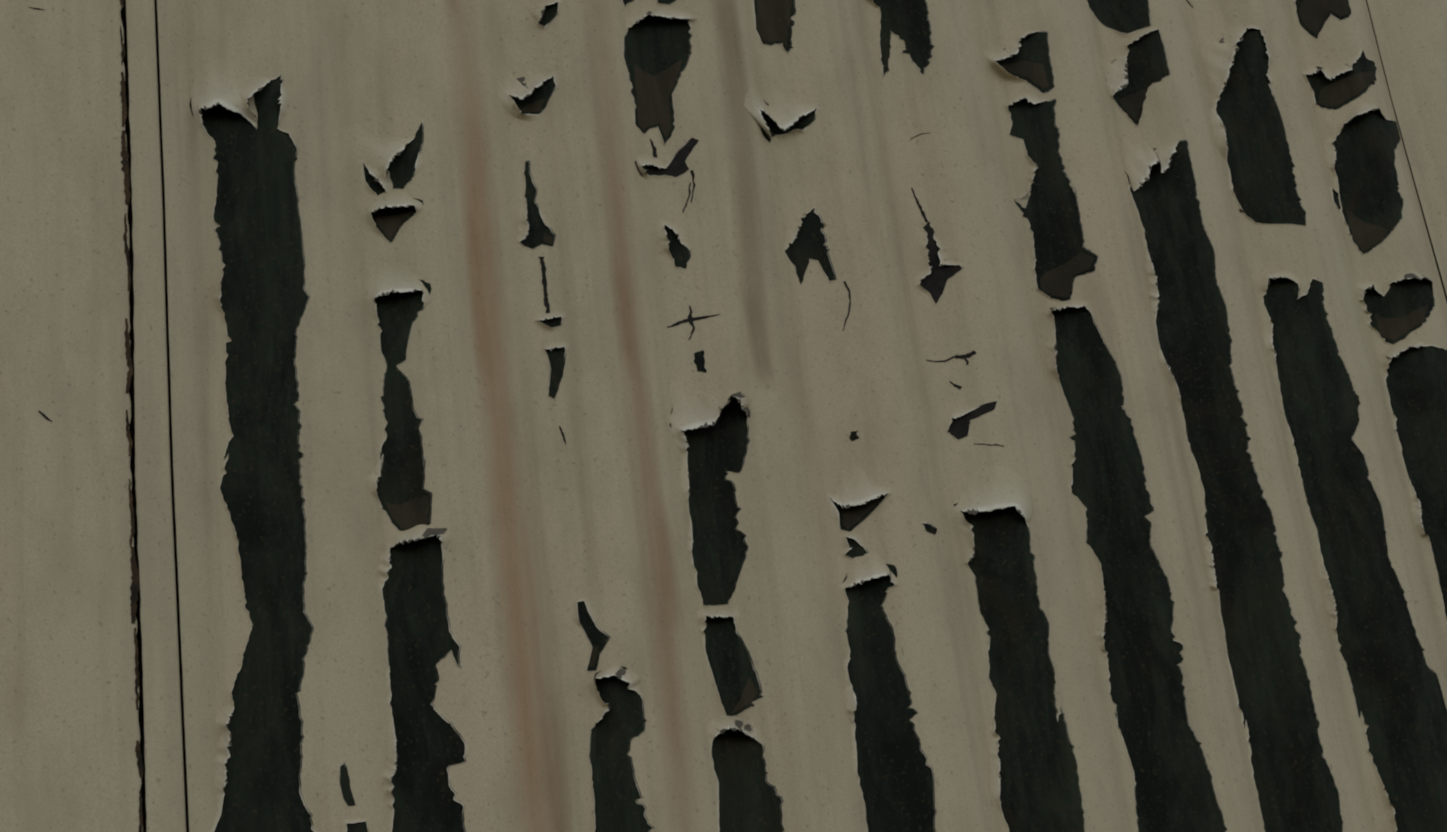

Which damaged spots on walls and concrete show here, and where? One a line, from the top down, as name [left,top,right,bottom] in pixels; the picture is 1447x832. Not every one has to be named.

peeling [190,59,321,832]
peeling [355,119,426,244]
peeling [365,262,470,832]
peeling [572,598,655,832]
peeling [621,0,698,147]
peeling [667,350,786,832]
peeling [826,467,938,832]
peeling [951,465,1085,832]
peeling [984,29,1228,832]
peeling [1086,0,1352,832]
peeling [1301,49,1404,256]
peeling [1259,271,1447,832]